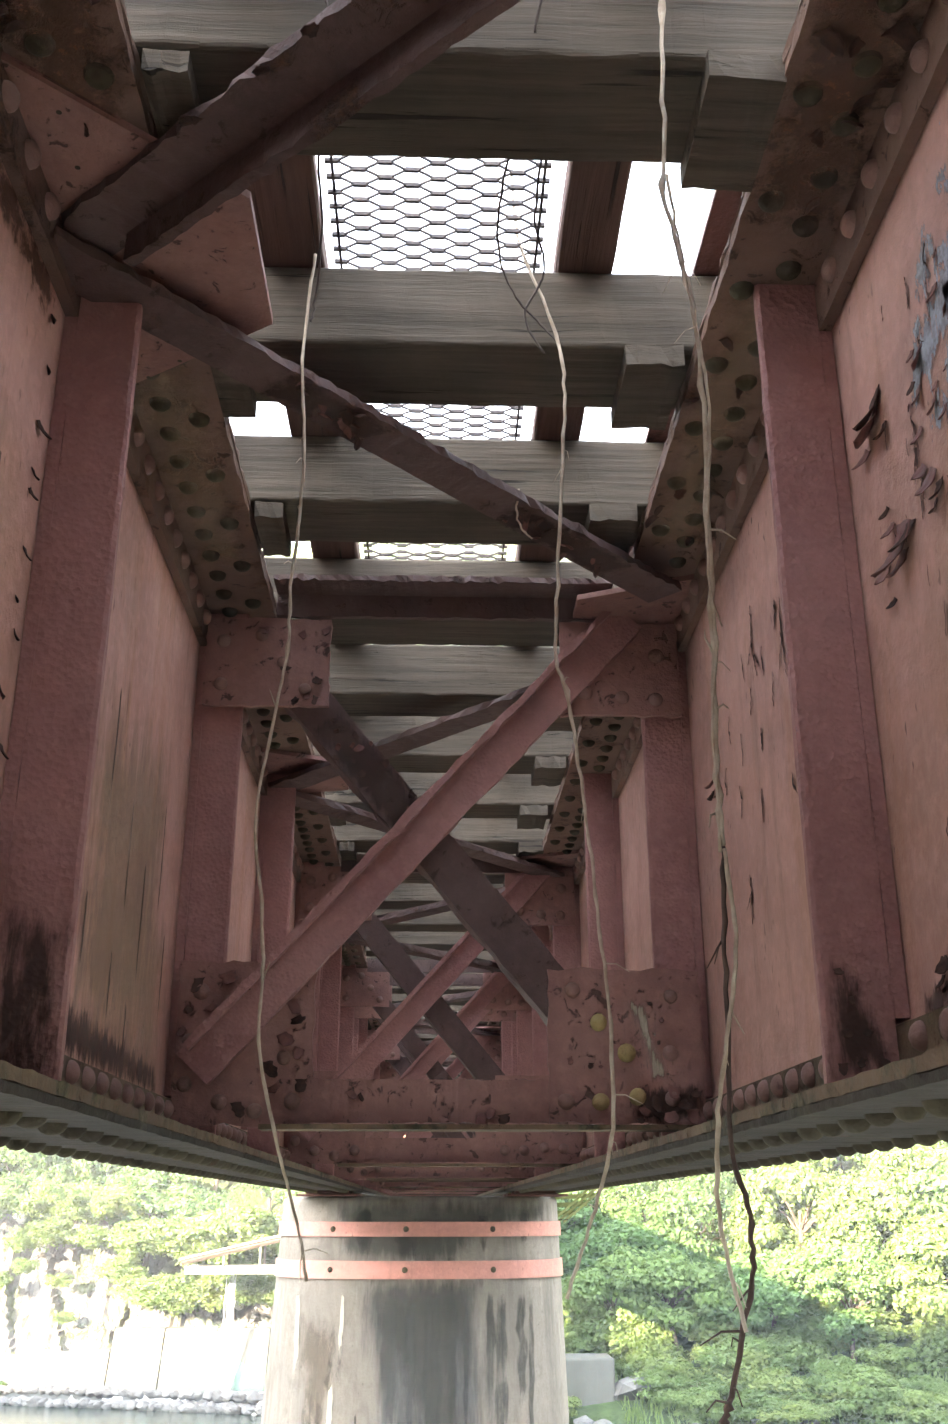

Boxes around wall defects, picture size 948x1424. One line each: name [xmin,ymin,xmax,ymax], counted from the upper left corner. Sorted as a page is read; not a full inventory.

peeling [906,224,948,445]
peeling [851,384,887,470]
peeling [871,463,943,585]
leakage [294,1295,344,1424]
leakage [373,1284,535,1424]